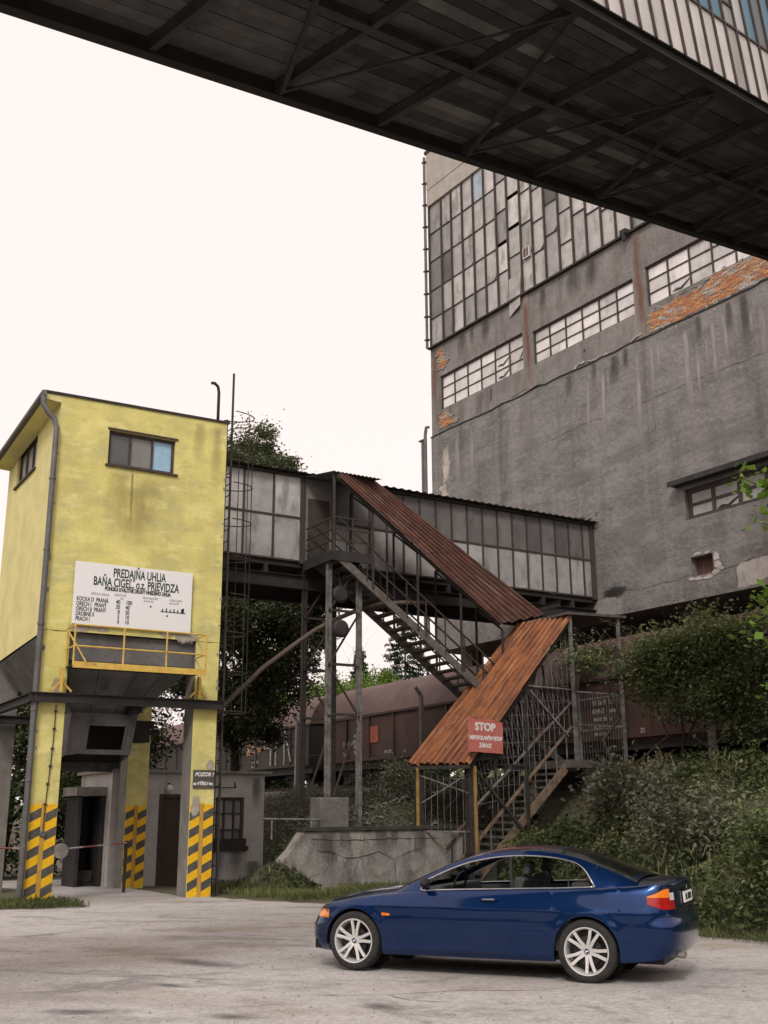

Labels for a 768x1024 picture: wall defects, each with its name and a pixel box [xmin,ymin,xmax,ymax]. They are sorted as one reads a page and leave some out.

flaking render [629,256,768,343]
flaking render [435,346,450,371]
leakage [683,306,767,403]
leakage [587,344,660,432]
flaking render [437,410,458,430]
spalling [689,550,724,581]
flaking render [737,556,768,588]
crack [312,837,437,875]